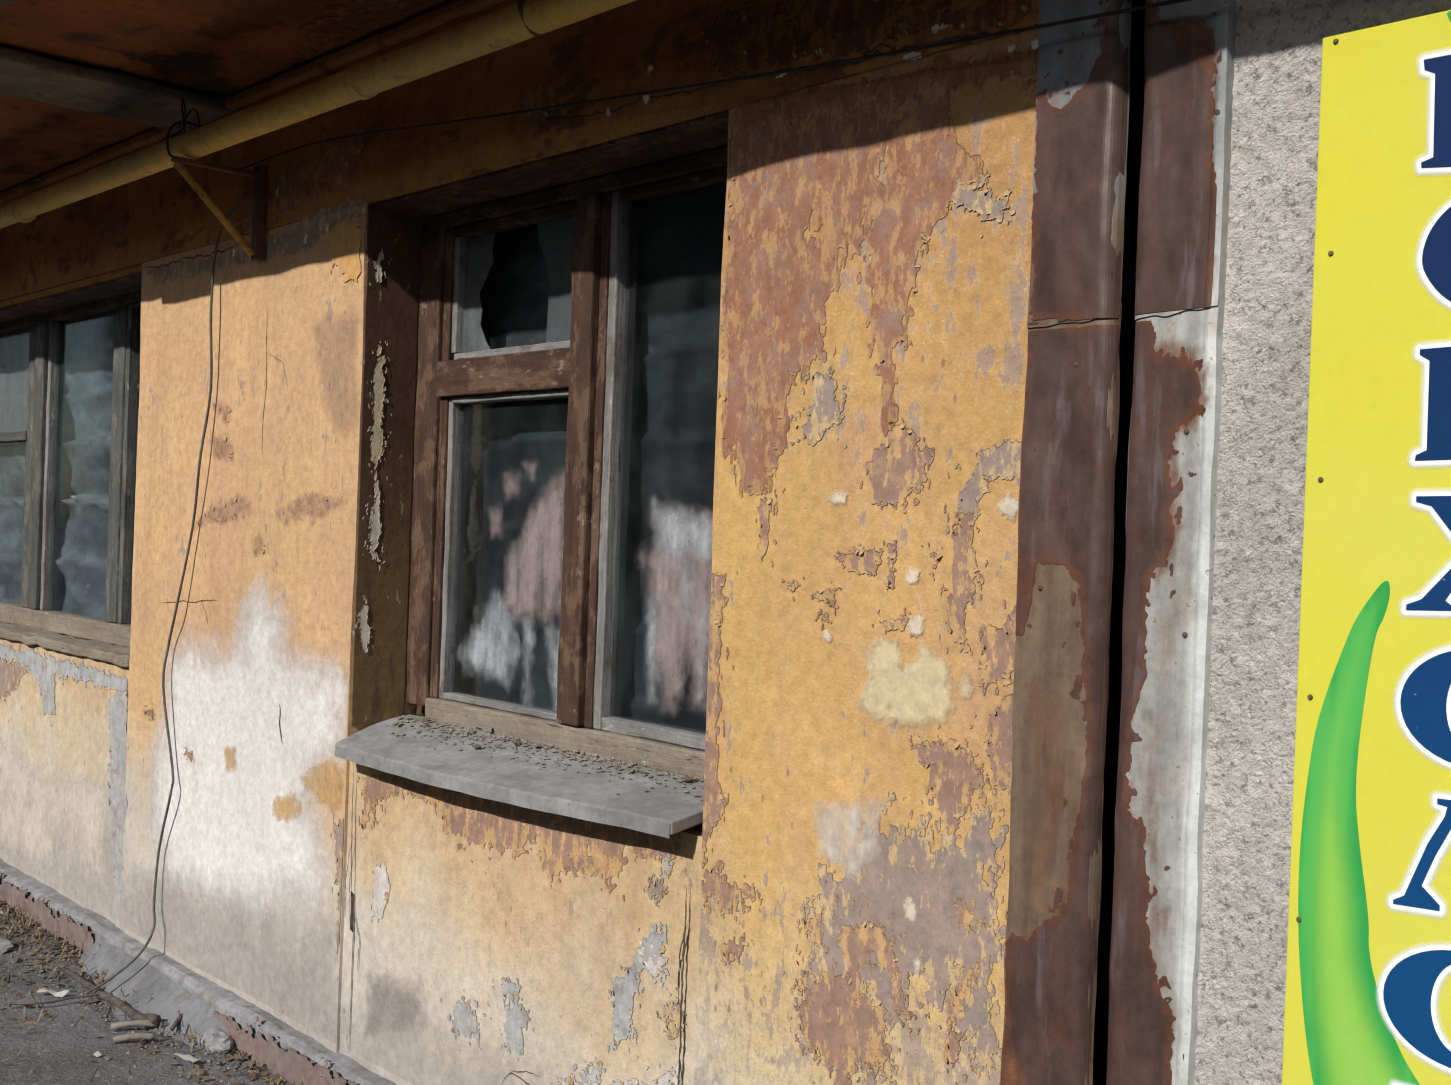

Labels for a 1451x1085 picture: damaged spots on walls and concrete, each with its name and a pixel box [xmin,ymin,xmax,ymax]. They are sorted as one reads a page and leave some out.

peeling [147,189,369,296]
peeling [366,249,392,285]
peeling [362,340,392,570]
peeling [717,0,1221,1085]
flaking render [0,643,155,726]
peeling [225,747,235,770]
peeling [273,570,762,1085]
peeling [0,872,100,952]